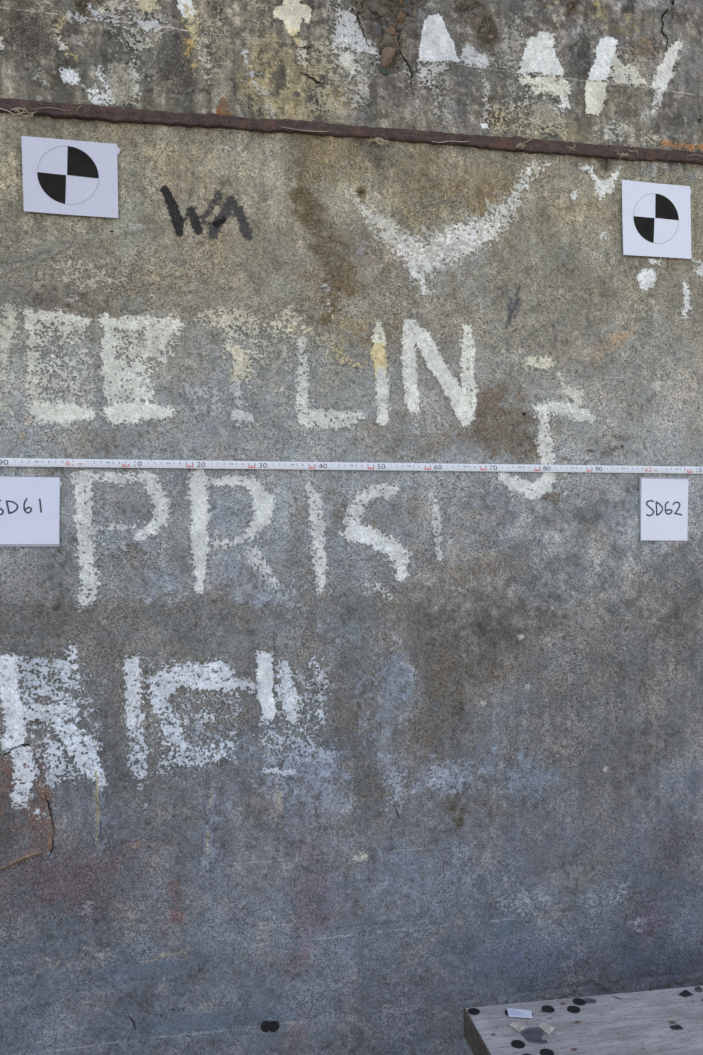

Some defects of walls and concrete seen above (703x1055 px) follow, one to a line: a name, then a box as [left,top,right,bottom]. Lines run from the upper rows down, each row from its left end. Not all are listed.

crack [661,0,674,49]
crack [3,793,55,869]